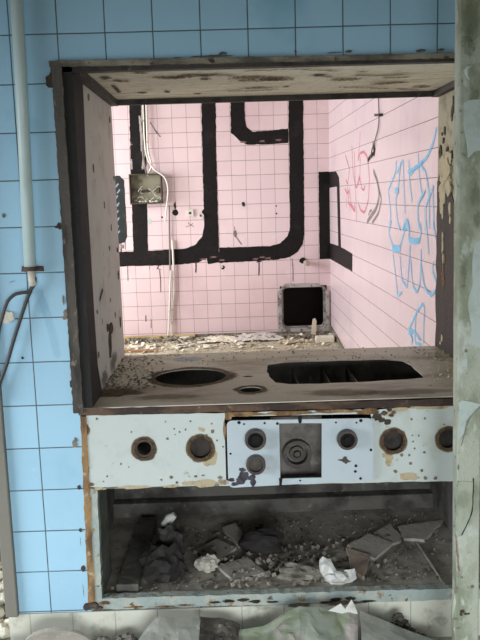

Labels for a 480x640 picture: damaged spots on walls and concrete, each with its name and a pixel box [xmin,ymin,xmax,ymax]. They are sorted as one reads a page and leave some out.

peeling [438,96,455,224]
corrosion [131,437,157,461]
corrosion [186,434,215,462]
peeling [198,406,450,466]
corrosion [379,427,407,455]
peeling [160,468,256,488]
corrosion [320,596,376,604]